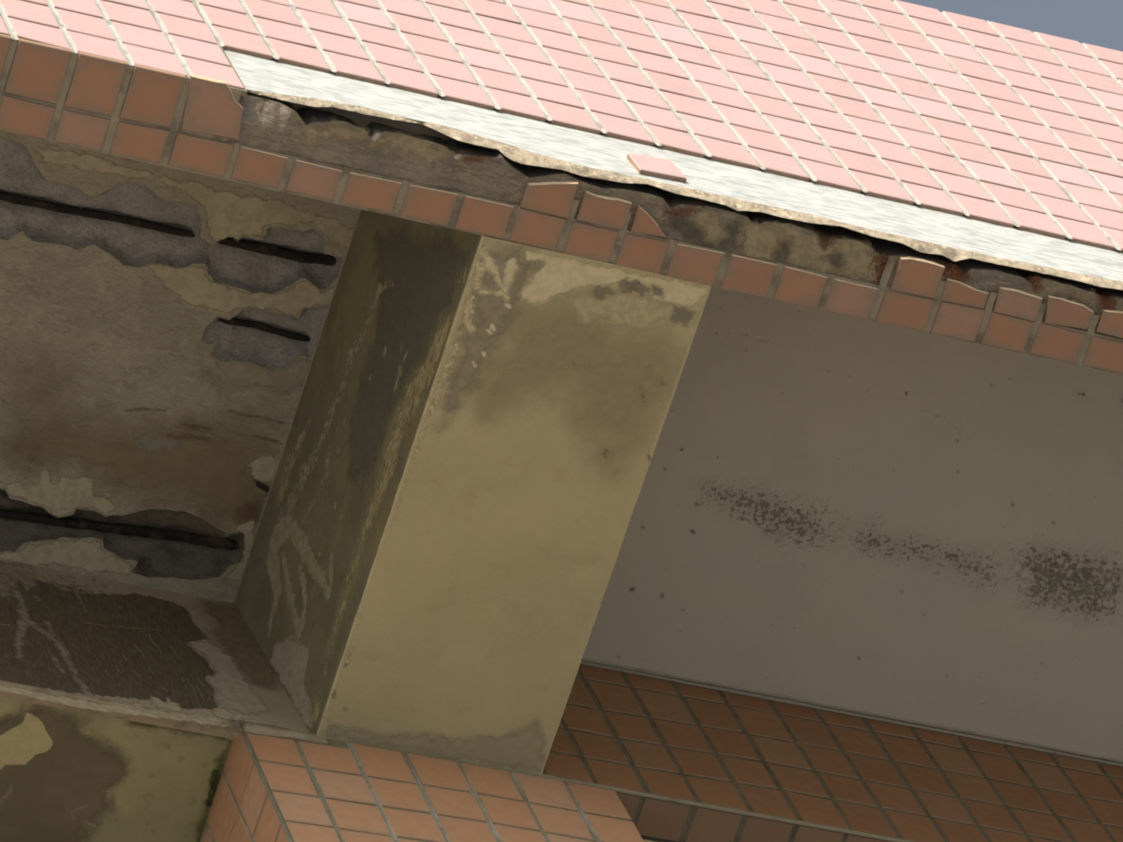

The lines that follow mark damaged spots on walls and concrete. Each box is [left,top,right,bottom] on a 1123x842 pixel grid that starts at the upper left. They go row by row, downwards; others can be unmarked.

peeling [223,49,1123,339]
spalling [0,135,354,372]
leakage [447,249,540,411]
leakage [594,280,663,299]
spalling [0,466,255,581]
leakage [708,488,829,543]
leakage [856,532,996,587]
leakage [1016,548,1122,620]
peeling [0,642,268,728]
peeling [0,713,53,770]
leakage [0,706,126,842]